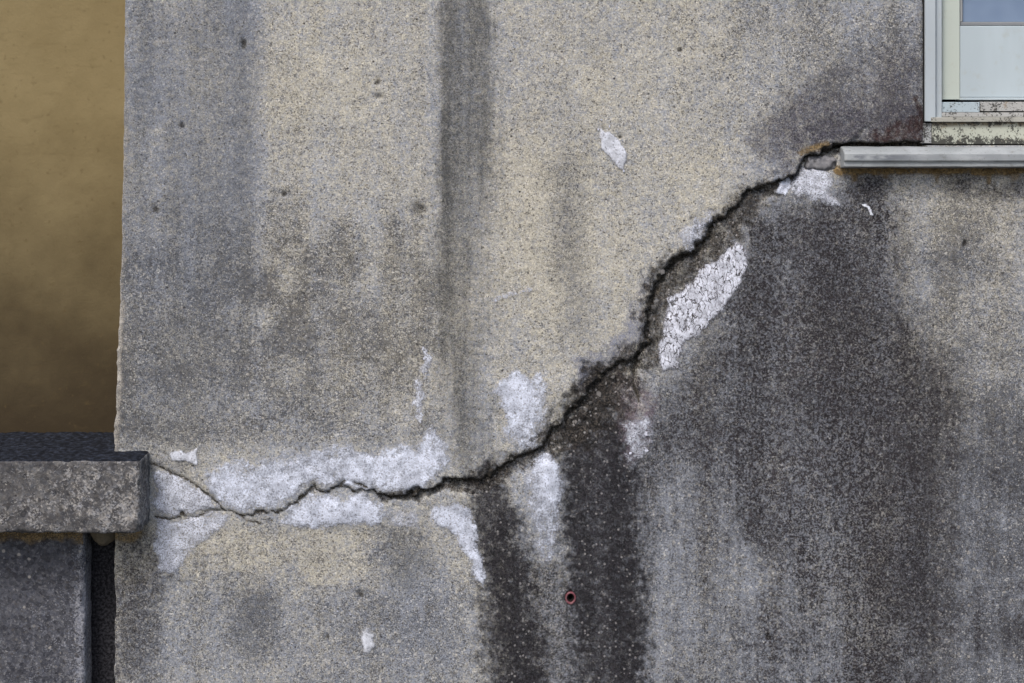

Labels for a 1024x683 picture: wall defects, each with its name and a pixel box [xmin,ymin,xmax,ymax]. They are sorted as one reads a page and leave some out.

rust [870,96,927,147]
water stain [115,347,449,680]
crack [152,139,926,524]
water stain [431,174,1024,683]